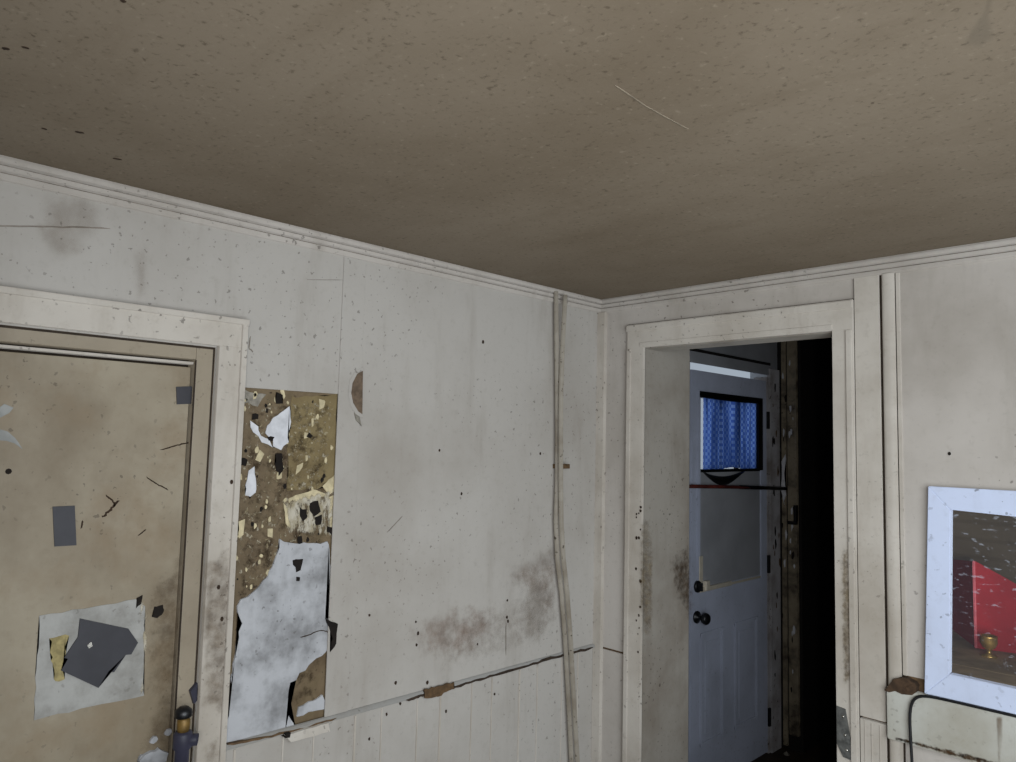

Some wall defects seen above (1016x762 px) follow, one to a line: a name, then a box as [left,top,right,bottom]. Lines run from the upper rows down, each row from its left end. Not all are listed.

peeling [226,388,338,745]